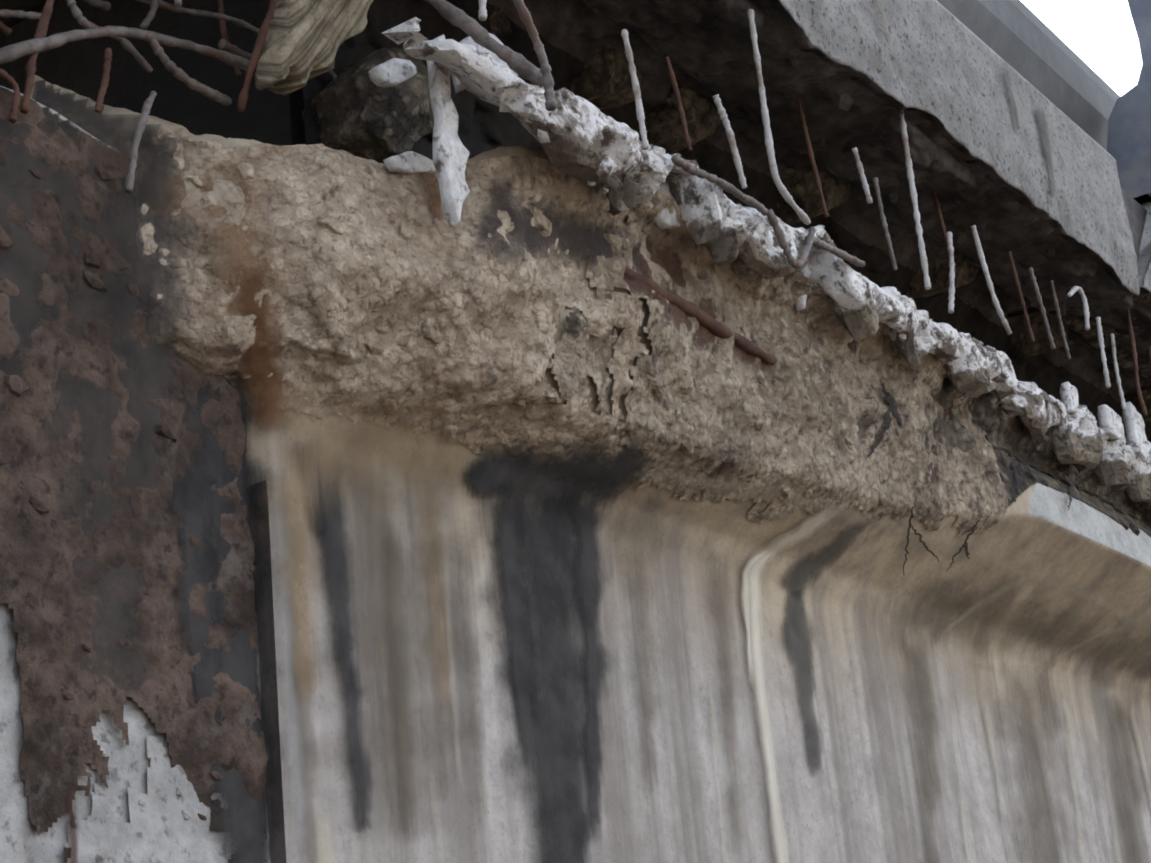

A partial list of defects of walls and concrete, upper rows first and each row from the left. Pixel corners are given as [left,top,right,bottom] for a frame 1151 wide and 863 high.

spalling [0,0,278,863]
corrosion [245,276,280,424]
water stain [300,440,371,829]
water stain [466,443,649,863]
spalling [150,0,1151,537]
corrosion [623,231,770,366]
water stain [784,521,863,772]
crack [867,383,902,457]
crack [903,500,980,575]
corrosion [68,801,77,863]